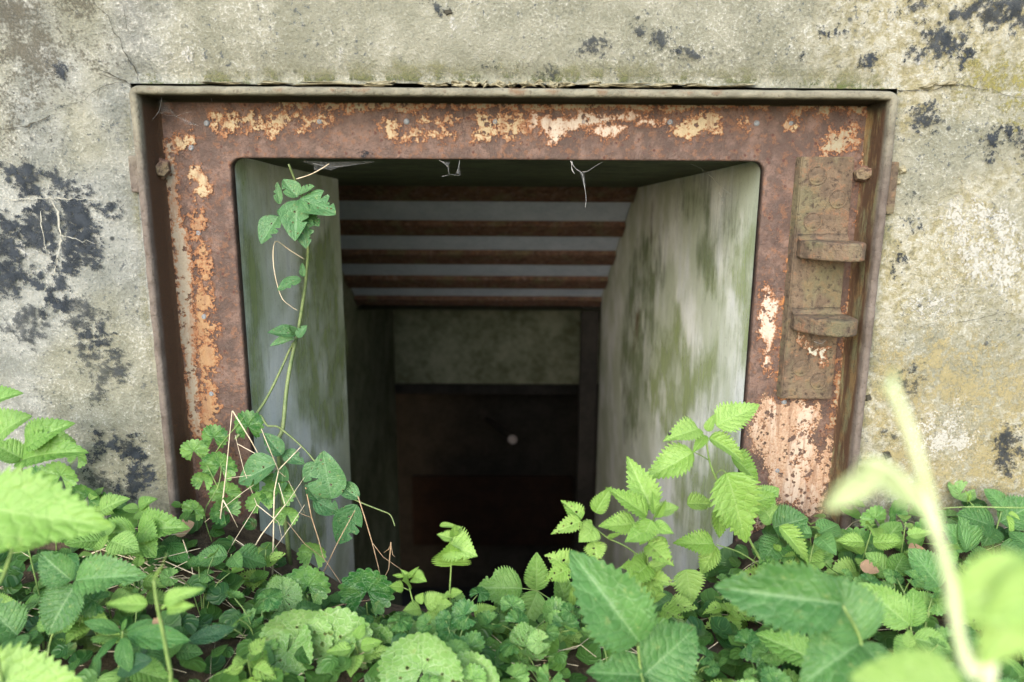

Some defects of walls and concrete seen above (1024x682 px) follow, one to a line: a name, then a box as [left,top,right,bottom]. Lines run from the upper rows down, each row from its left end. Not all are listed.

crack [2,3,139,130]
water stain [947,39,1024,134]
water stain [622,237,712,433]
water stain [697,199,713,280]
water stain [732,227,752,363]
water stain [863,198,1024,505]
water stain [675,447,733,532]